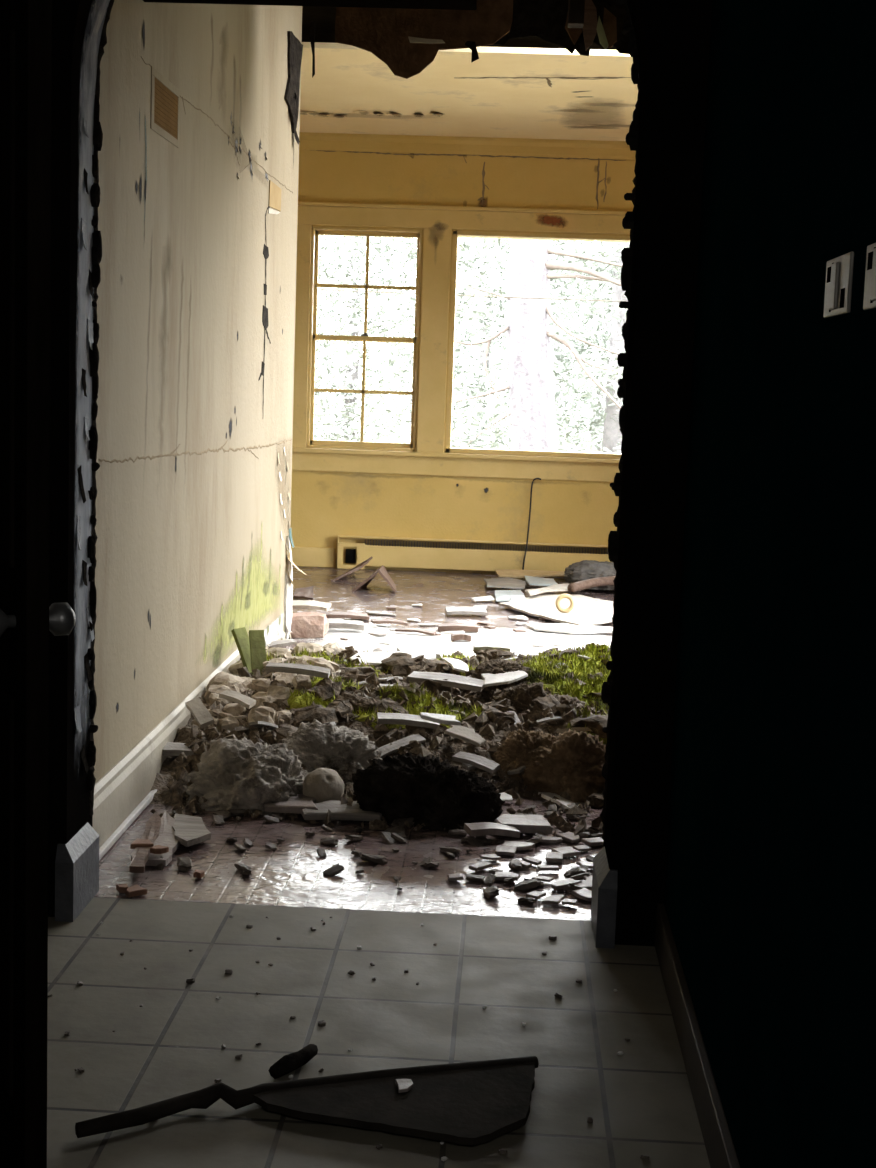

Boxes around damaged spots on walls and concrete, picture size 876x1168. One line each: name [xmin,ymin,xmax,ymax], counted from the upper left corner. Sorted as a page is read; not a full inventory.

crack [180,96,293,405]
crack [99,439,292,463]